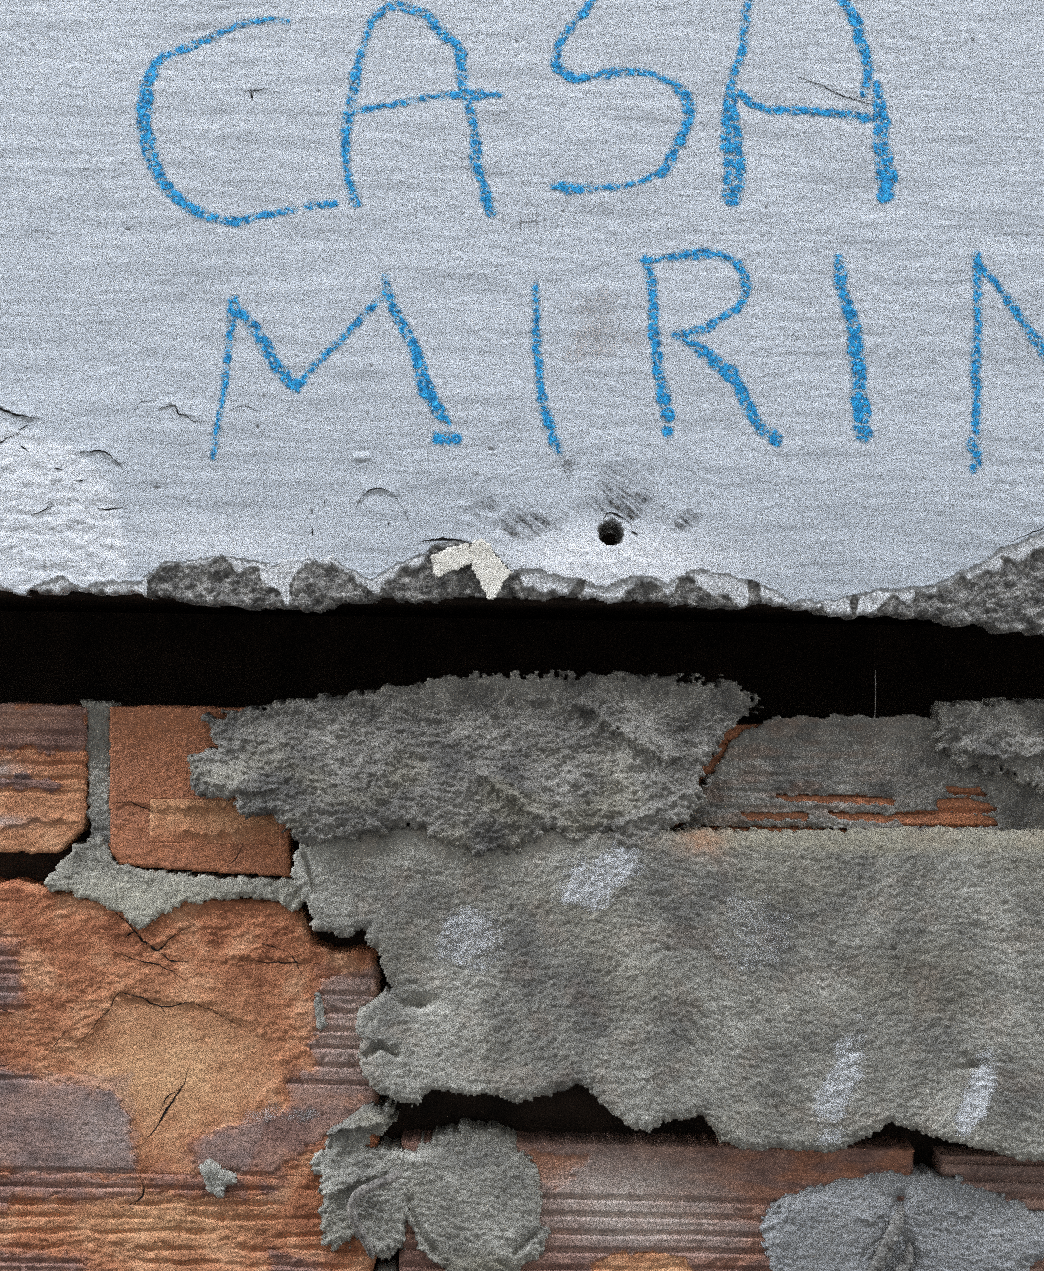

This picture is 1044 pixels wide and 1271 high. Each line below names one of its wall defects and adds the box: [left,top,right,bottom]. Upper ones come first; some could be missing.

crack [0,408,33,450]
crack [53,450,119,481]
spalling [0,532,1044,636]
spalling [0,745,91,854]
spalling [148,799,279,845]
crack [52,906,241,1048]
spalling [0,877,380,1271]
spalling [591,1250,693,1271]